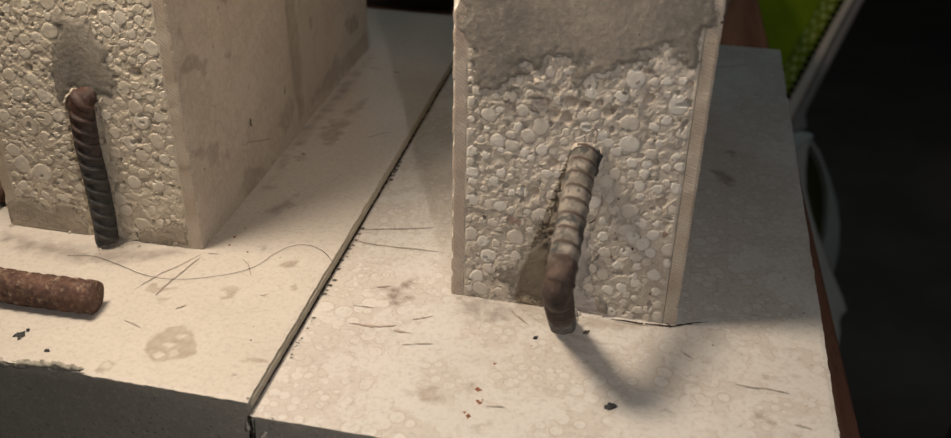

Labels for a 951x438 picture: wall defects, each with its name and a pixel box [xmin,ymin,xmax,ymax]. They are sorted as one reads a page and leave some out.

peeling [527,72,547,114]
spalling [571,142,606,177]
crack [250,68,453,438]